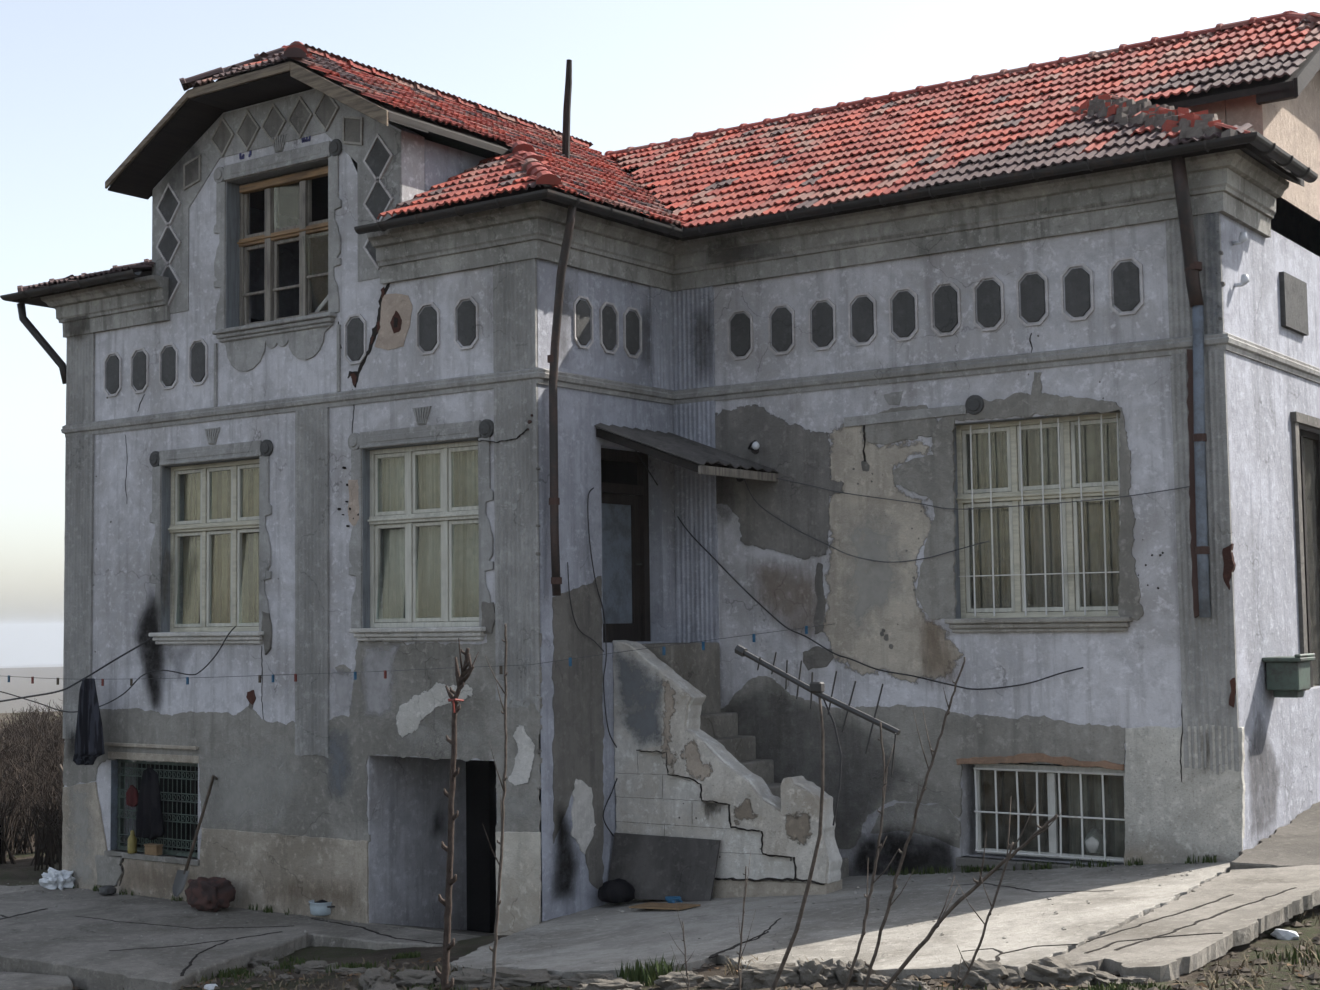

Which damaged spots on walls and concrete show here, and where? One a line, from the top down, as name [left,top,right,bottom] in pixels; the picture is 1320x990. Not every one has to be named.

spalling [1070,93,1257,144]
crack [338,283,390,433]
rust [1187,349,1199,618]
flaking render [823,423,963,683]
spalling [396,682,474,738]
spalling [508,724,542,790]
spalling [661,681,713,819]
crack [636,749,825,885]
spalling [734,799,758,825]
spalling [785,811,813,861]